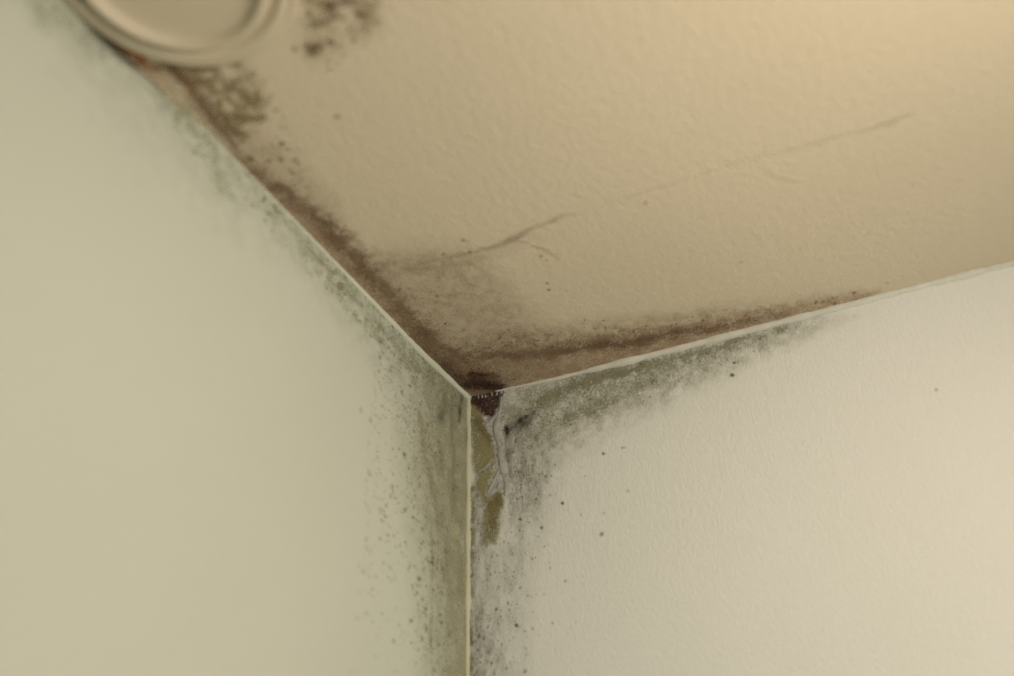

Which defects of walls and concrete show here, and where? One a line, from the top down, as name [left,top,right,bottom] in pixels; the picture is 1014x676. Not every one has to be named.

damp [83,20,263,136]
peeling [478,391,509,497]
damp [239,148,869,676]